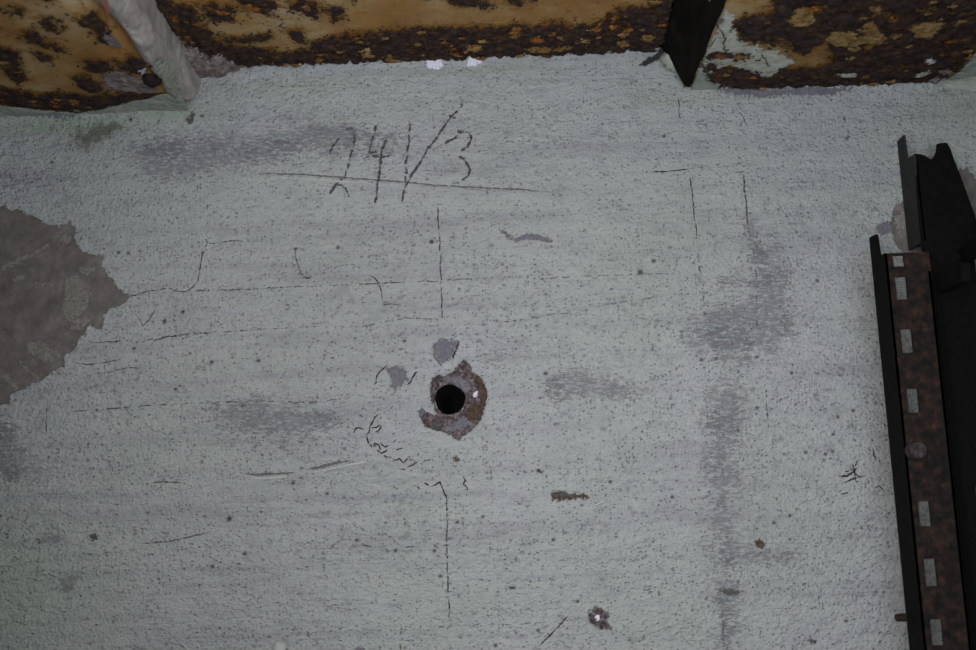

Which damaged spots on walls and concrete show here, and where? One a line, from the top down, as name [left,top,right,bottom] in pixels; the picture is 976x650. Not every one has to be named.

corrosion [0,0,167,121]
corrosion [155,0,674,68]
corrosion [698,0,976,99]
corrosion [466,374,487,421]
crack [354,415,468,497]